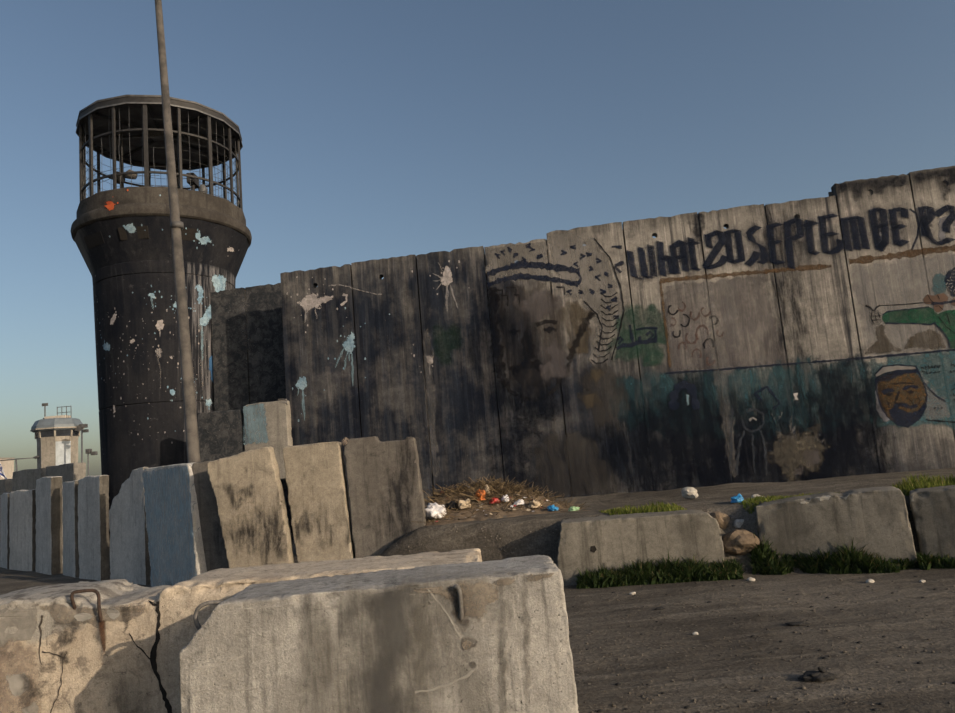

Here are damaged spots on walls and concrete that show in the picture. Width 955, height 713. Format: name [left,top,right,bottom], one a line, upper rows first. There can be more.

crack [38,615,67,713]
crack [129,600,172,713]